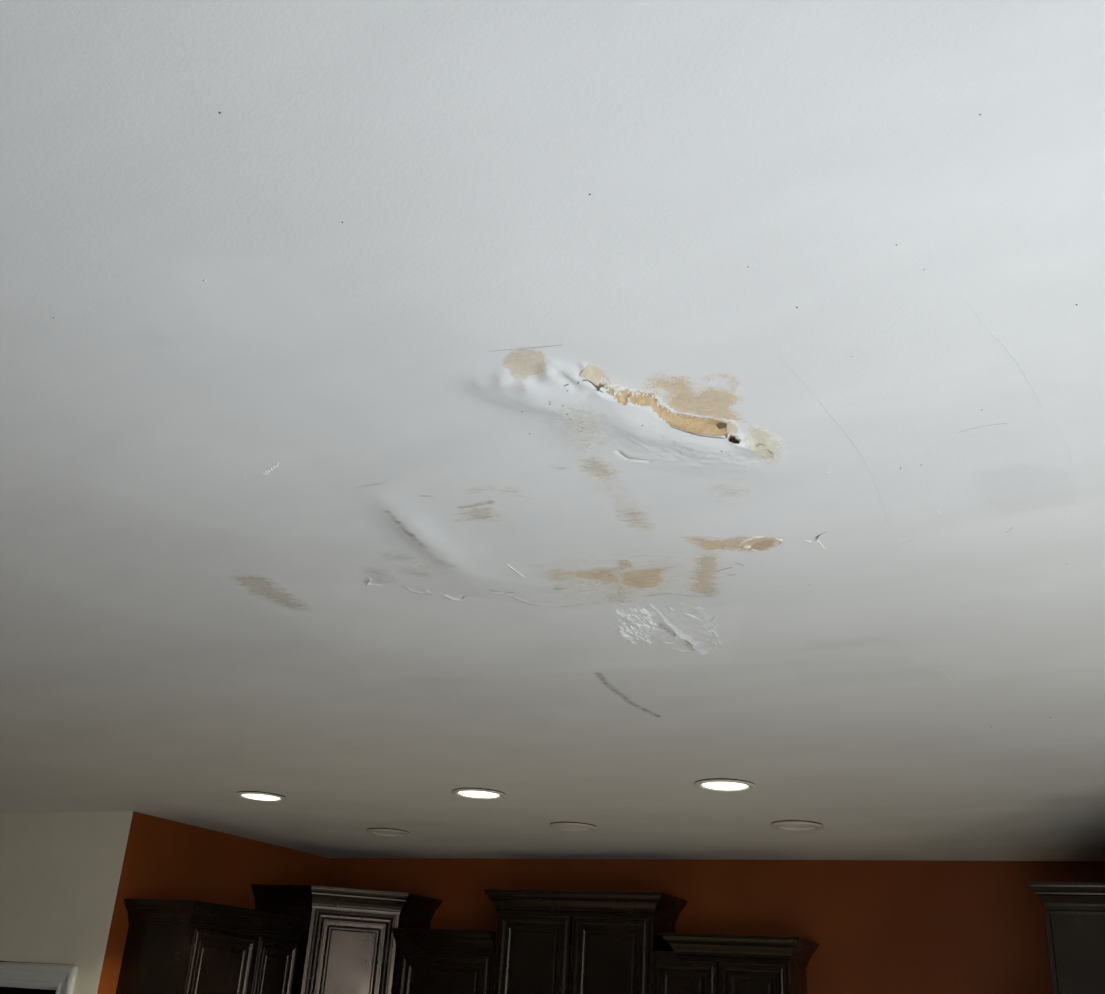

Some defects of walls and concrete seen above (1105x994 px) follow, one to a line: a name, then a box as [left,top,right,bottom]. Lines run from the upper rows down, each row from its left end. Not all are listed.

flaking render [612,602,725,656]